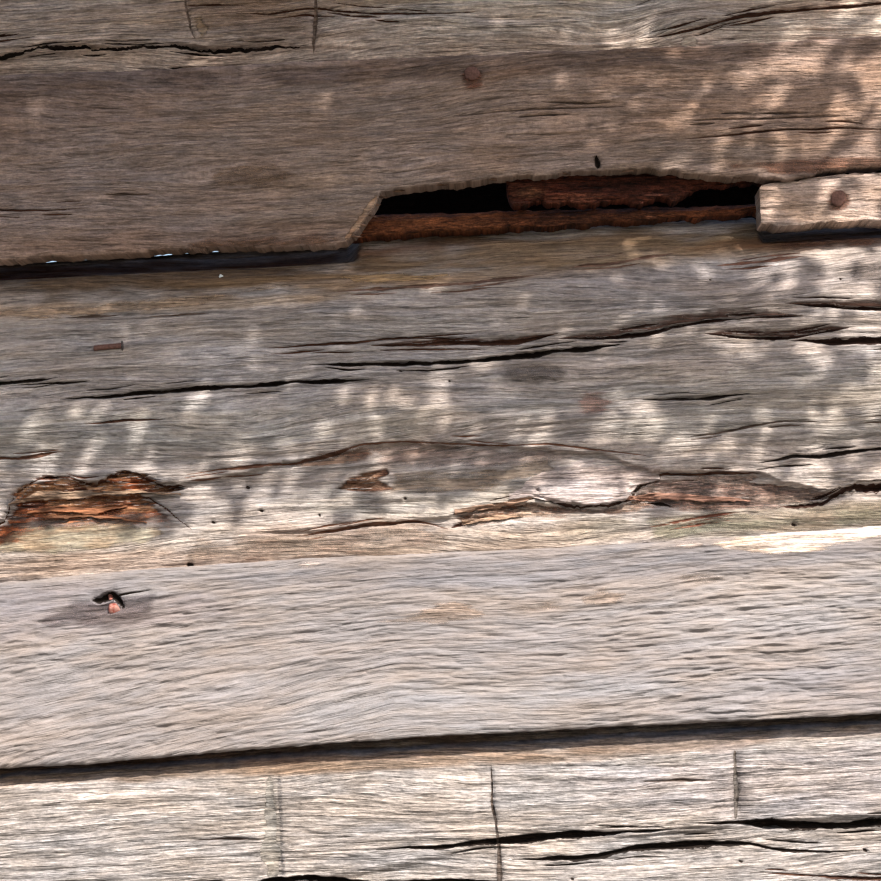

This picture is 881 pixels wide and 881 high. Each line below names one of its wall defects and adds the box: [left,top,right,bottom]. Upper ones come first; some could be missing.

crack [0,34,309,69]
crack [188,3,478,22]
crack [634,0,881,40]
spalling [345,190,405,240]
crack [0,296,881,424]
spalling [0,490,181,554]
crack [0,435,640,530]
crack [298,447,881,539]
peeling [373,444,881,527]
rust [46,597,150,624]
crack [261,873,360,881]
crack [378,813,881,881]